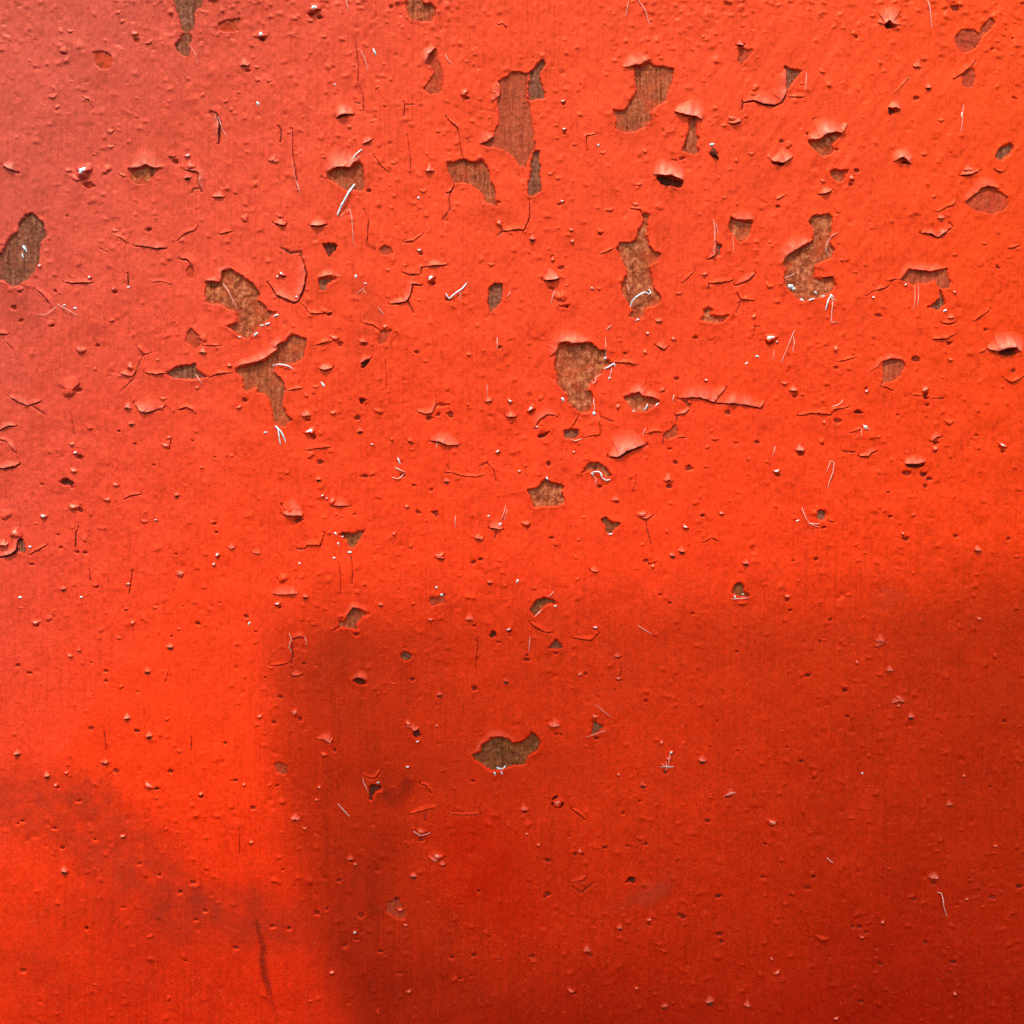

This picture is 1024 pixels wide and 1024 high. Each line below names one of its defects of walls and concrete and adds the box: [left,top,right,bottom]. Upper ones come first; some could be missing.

peeling [325,144,371,192]
peeling [479,61,545,197]
peeling [614,52,718,188]
peeling [806,117,848,157]
peeling [0,214,46,293]
peeling [186,264,278,339]
peeling [617,214,661,321]
peeling [777,215,835,302]
peeling [896,261,951,312]
peeling [233,330,306,433]
peeling [547,329,611,415]
peeling [470,729,540,775]